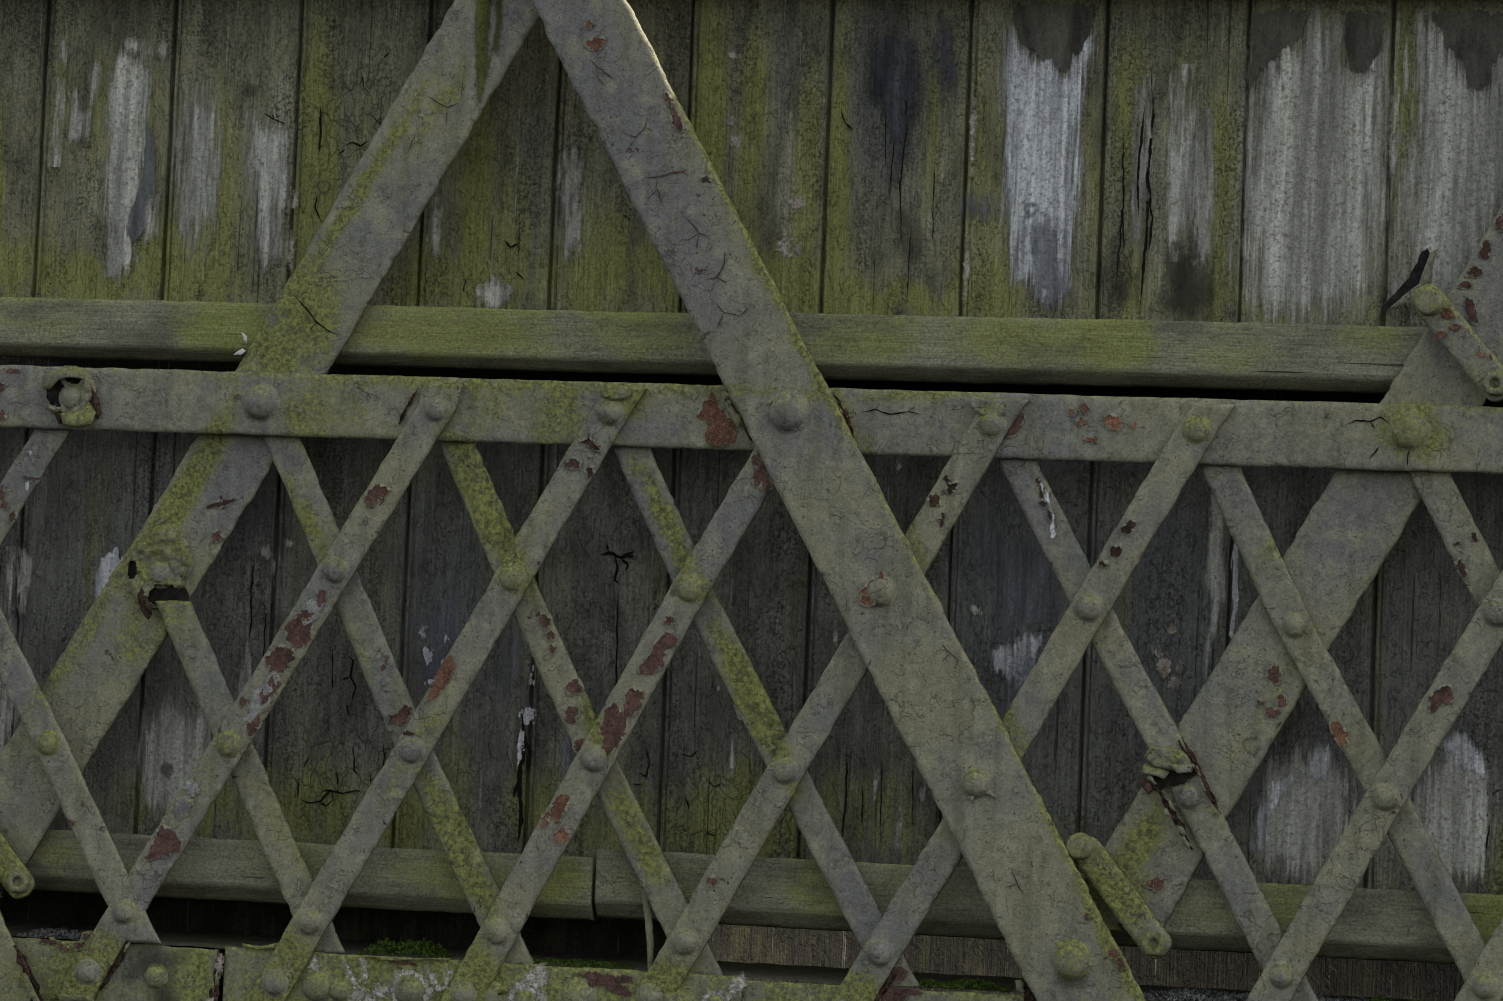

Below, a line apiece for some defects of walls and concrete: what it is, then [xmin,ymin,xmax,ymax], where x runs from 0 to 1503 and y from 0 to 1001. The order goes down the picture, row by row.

crack [1115,68,1155,315]
rust [1435,210,1503,339]
rust [695,387,774,494]
rust [238,588,328,738]
rust [537,612,558,655]
rust [563,614,678,761]
rust [144,823,184,863]